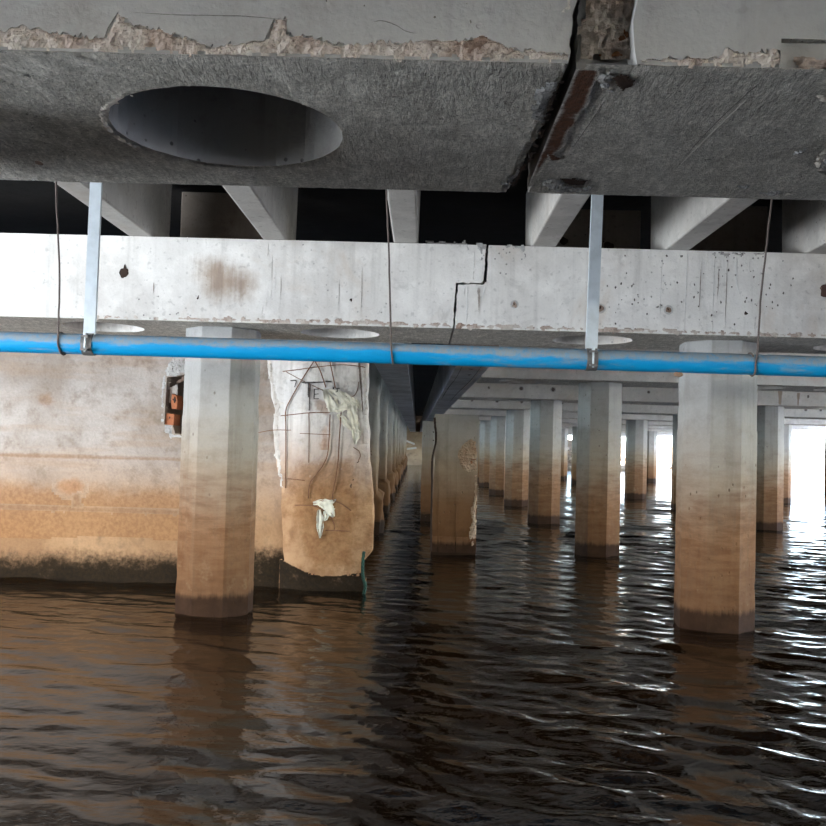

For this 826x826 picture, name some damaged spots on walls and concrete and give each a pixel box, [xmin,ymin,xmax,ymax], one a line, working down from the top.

spalling [0,14,568,62]
spalling [577,0,635,60]
spalling [596,72,635,92]
spalling [661,47,780,69]
corrosion [528,69,601,187]
spalling [160,357,185,439]
spalling [258,360,368,532]
leakage [0,415,268,618]
spalling [458,439,477,546]